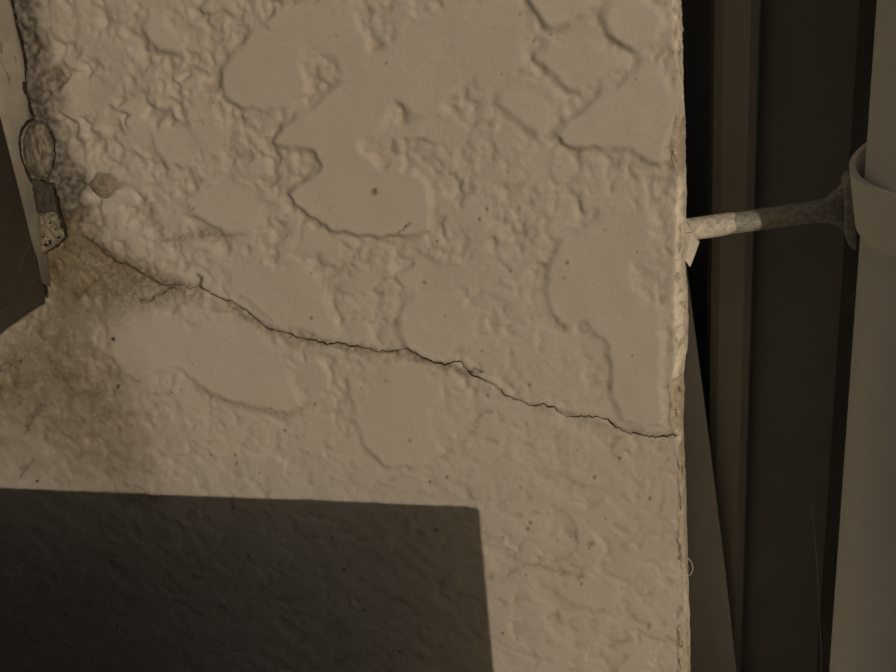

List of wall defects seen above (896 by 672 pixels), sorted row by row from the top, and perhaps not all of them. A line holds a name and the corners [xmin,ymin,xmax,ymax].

crack [86,237,677,439]